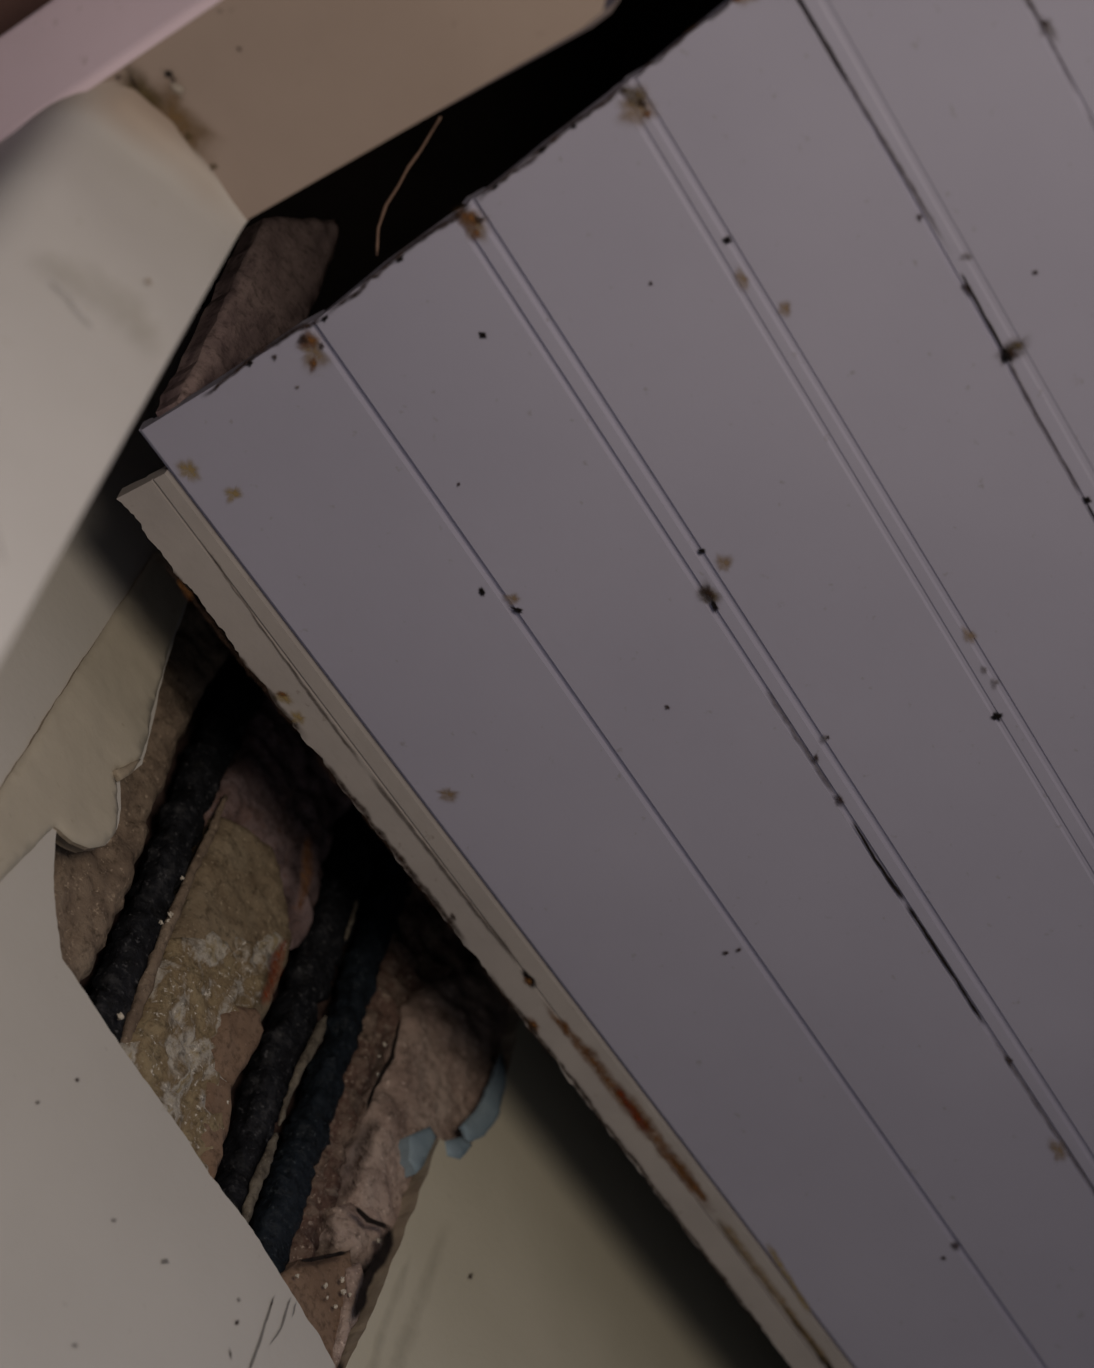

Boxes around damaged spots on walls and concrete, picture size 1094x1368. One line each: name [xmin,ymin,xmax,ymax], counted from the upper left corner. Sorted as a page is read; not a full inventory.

peeling [0,549,229,984]
spalling [117,692,352,1179]
spalling [241,990,337,1223]
spalling [280,880,511,1368]
rust [553,1017,705,1200]